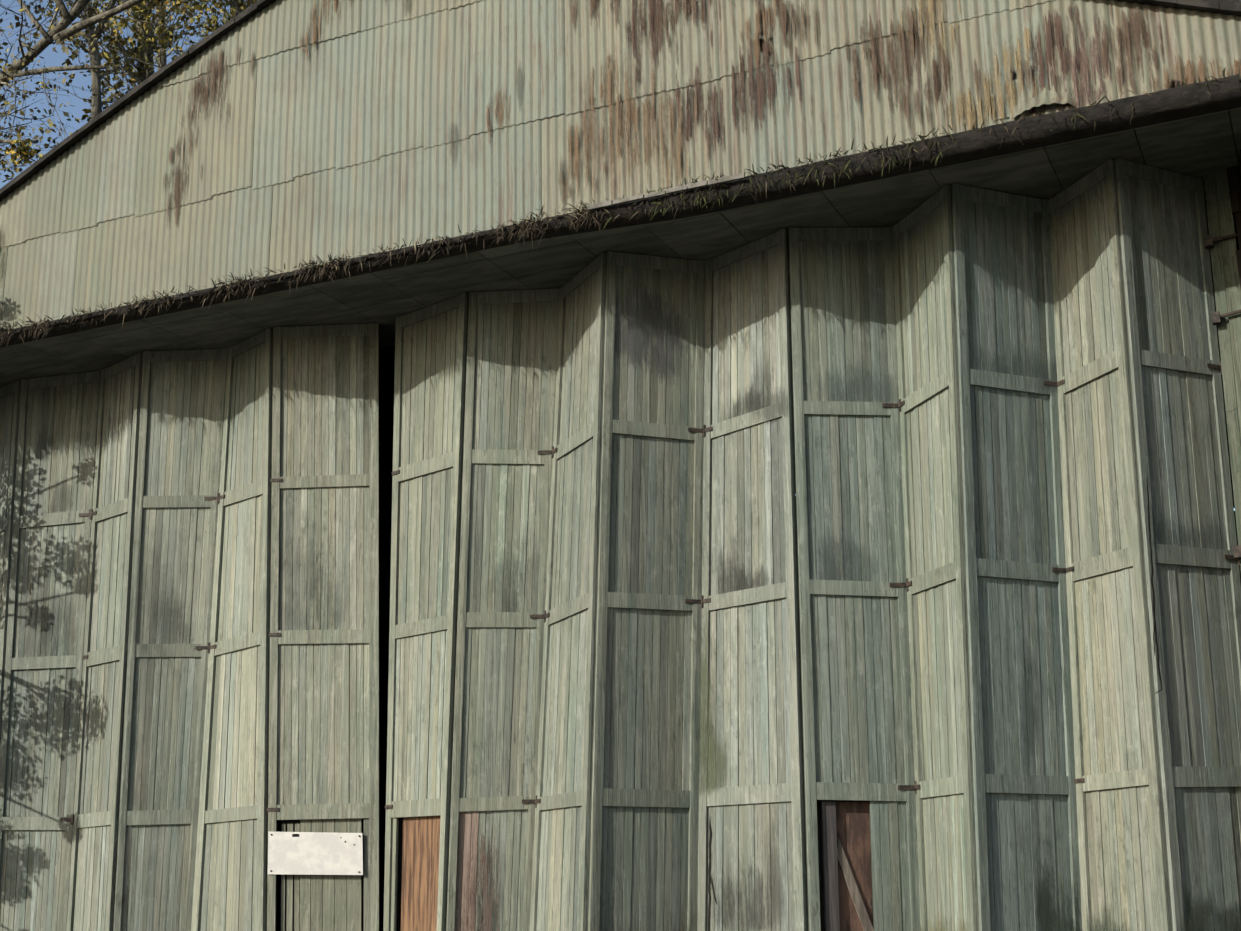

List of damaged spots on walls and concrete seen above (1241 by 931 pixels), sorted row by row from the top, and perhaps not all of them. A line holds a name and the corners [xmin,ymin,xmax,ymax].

corrosion [163,46,253,227]
corrosion [559,0,818,202]
corrosion [845,0,1241,135]
damp [1037,870,1055,931]